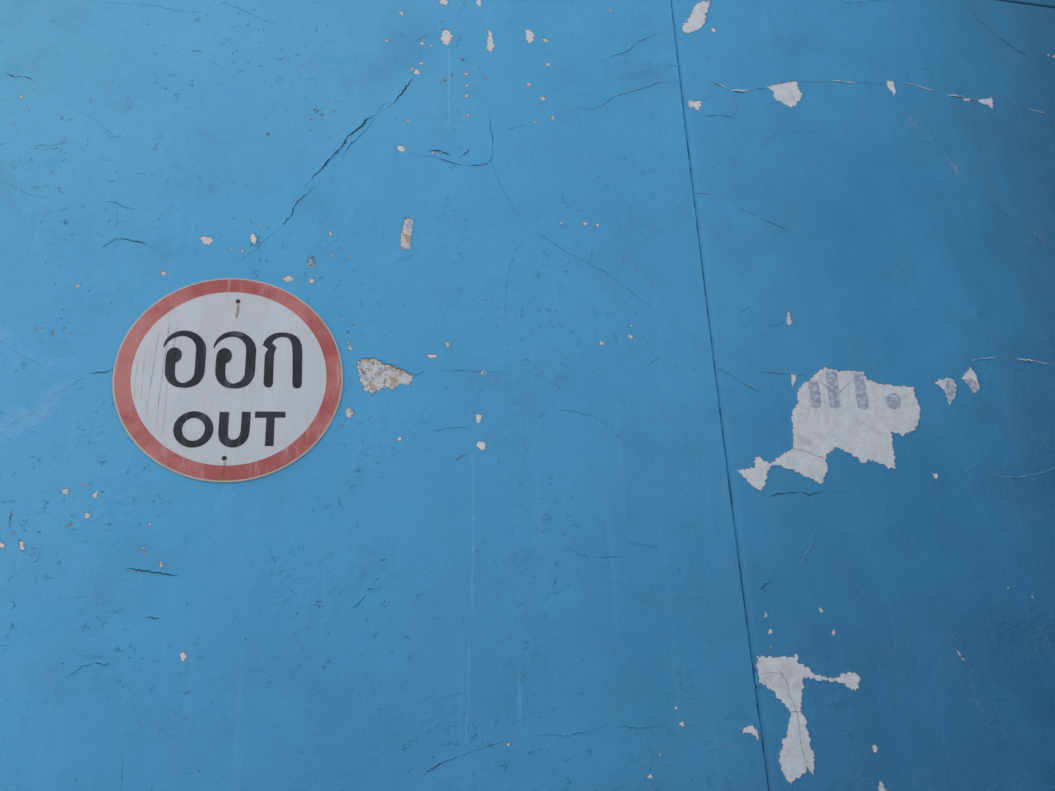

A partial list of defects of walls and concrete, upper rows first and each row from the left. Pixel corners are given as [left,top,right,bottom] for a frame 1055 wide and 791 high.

peeling [679,0,717,34]
crack [236,31,430,264]
crack [700,81,766,117]
peeling [765,79,804,109]
crack [798,67,1045,174]
flaking render [398,216,415,251]
crack [408,109,665,317]
flaking render [339,313,415,397]
crack [971,356,1055,366]
peeling [736,365,922,493]
peeling [754,610,862,788]